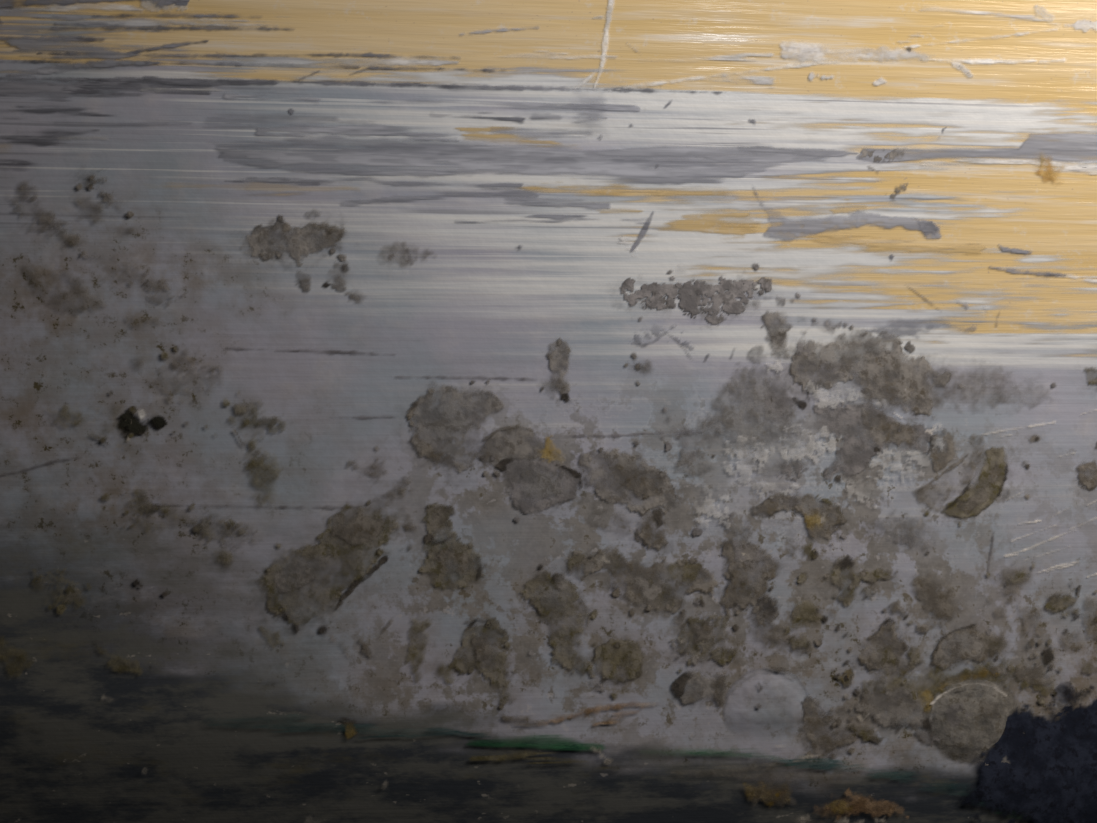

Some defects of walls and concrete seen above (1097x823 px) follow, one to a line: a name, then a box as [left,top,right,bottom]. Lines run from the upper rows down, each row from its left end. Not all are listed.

peeling [0,8,165,49]
peeling [1072,20,1097,32]
peeling [1013,255,1059,269]
peeling [948,292,1005,304]
peeling [810,361,834,382]
spalling [1010,571,1026,583]
spalling [1045,594,1076,612]
spalling [835,669,854,686]
spalling [672,671,728,705]
spalling [803,697,826,729]